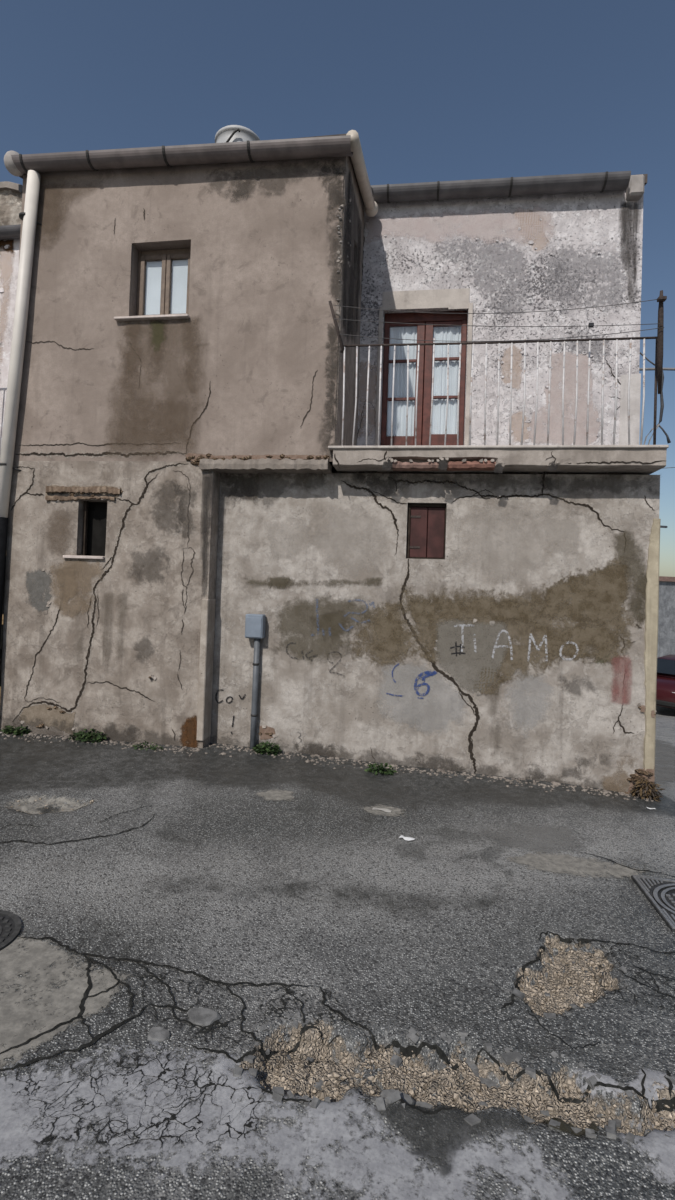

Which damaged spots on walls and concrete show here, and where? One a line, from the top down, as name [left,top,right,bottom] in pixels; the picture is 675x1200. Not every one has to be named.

crack [11,385,211,722]
peeling [434,619,509,695]
crack [334,392,665,774]
crack [5,957,380,1149]
crack [588,943,675,1012]